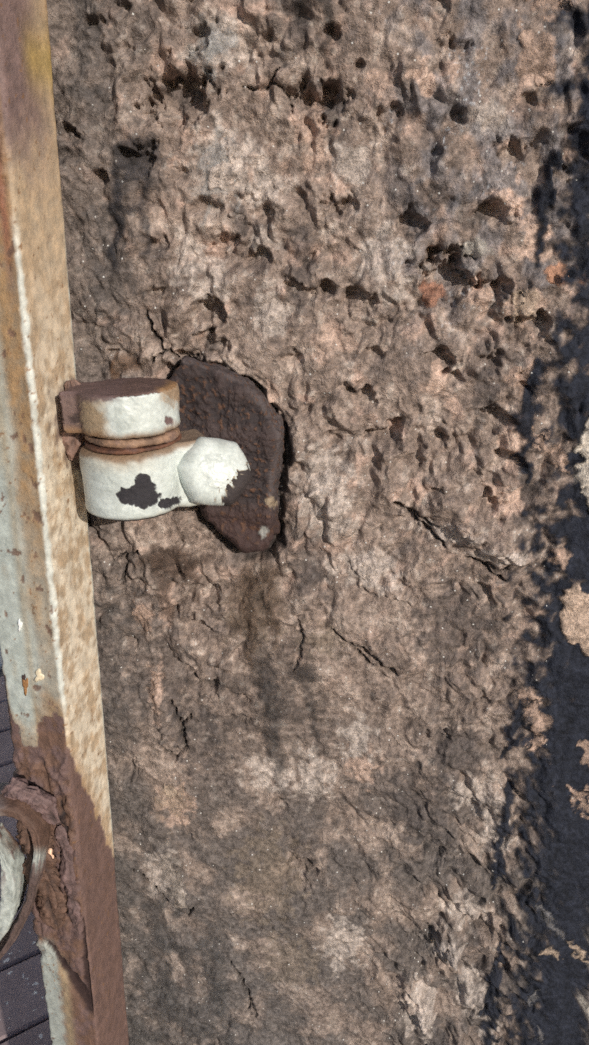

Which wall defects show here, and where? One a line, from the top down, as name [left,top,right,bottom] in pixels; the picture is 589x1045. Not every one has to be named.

crack [394,501,442,540]
corrosion [15,820,82,930]